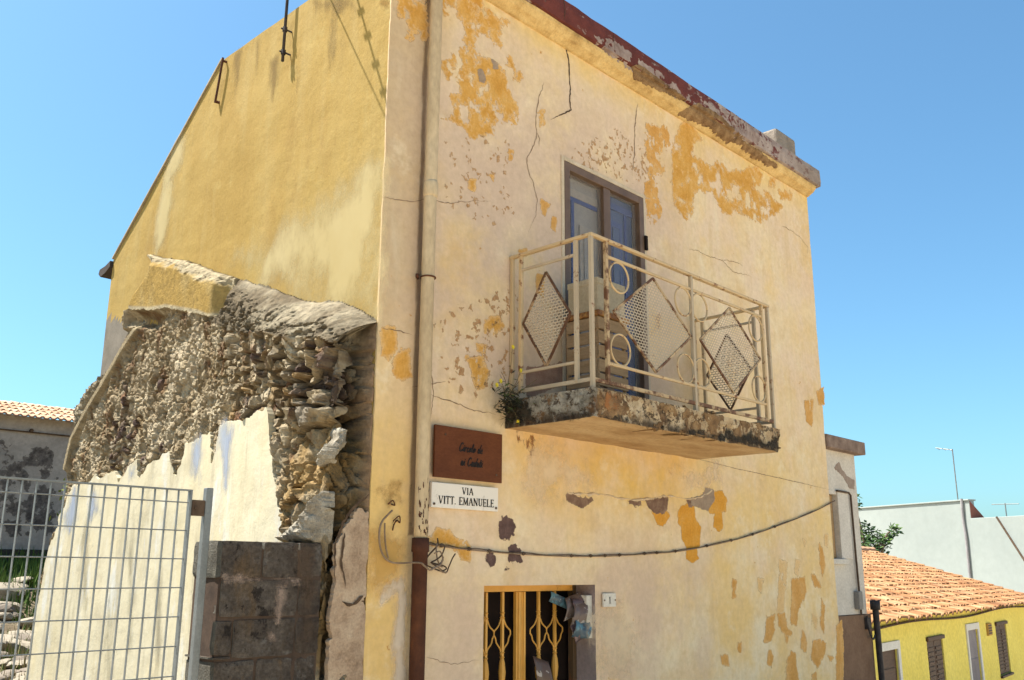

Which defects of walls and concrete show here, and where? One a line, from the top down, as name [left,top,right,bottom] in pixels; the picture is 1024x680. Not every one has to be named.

peeling [441,0,524,140]
crack [527,50,572,232]
peeling [594,35,793,224]
peeling [379,325,413,382]
water stain [0,440,76,537]
water stain [220,425,231,487]
flaking render [485,515,523,571]
water stain [505,397,539,425]
flaking render [566,492,593,508]
peeling [629,488,727,563]
mould [682,429,780,450]
peeling [763,534,844,680]